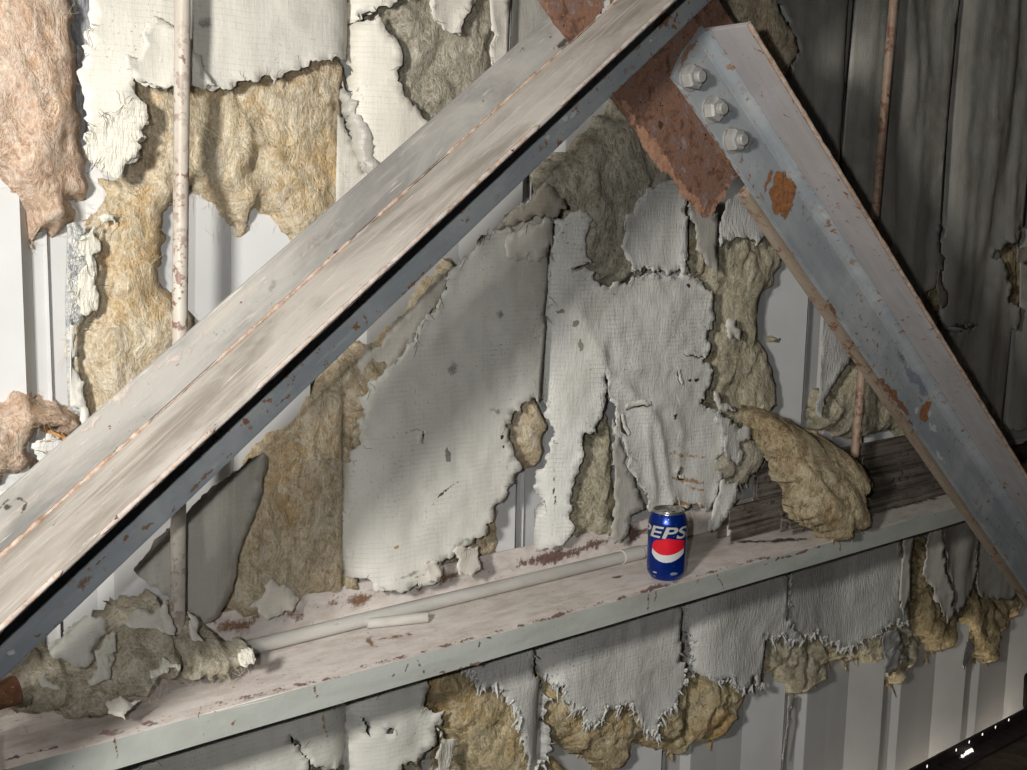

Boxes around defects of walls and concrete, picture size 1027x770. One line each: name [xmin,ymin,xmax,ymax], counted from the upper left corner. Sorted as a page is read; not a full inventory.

peeling [124,16,174,88]
peeling [190,42,215,90]
corrosion [612,84,730,216]
corrosion [747,21,1027,481]
corrosion [0,0,676,632]
peeling [899,529,955,623]
corrosion [235,676,339,701]
peeling [435,728,460,770]